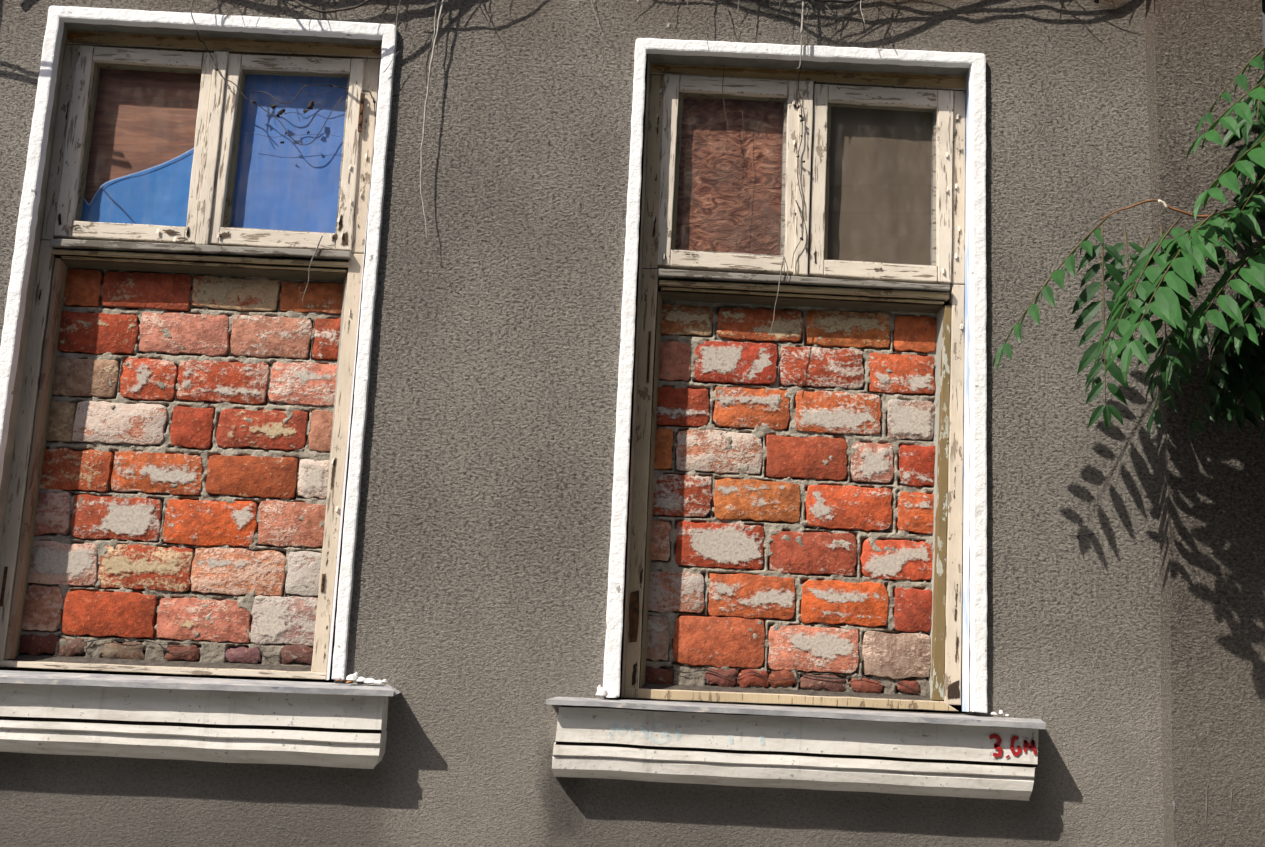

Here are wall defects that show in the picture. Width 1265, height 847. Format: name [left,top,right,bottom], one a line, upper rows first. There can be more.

peeling [330,154,367,246]
peeling [156,227,189,241]
peeling [947,680,960,699]